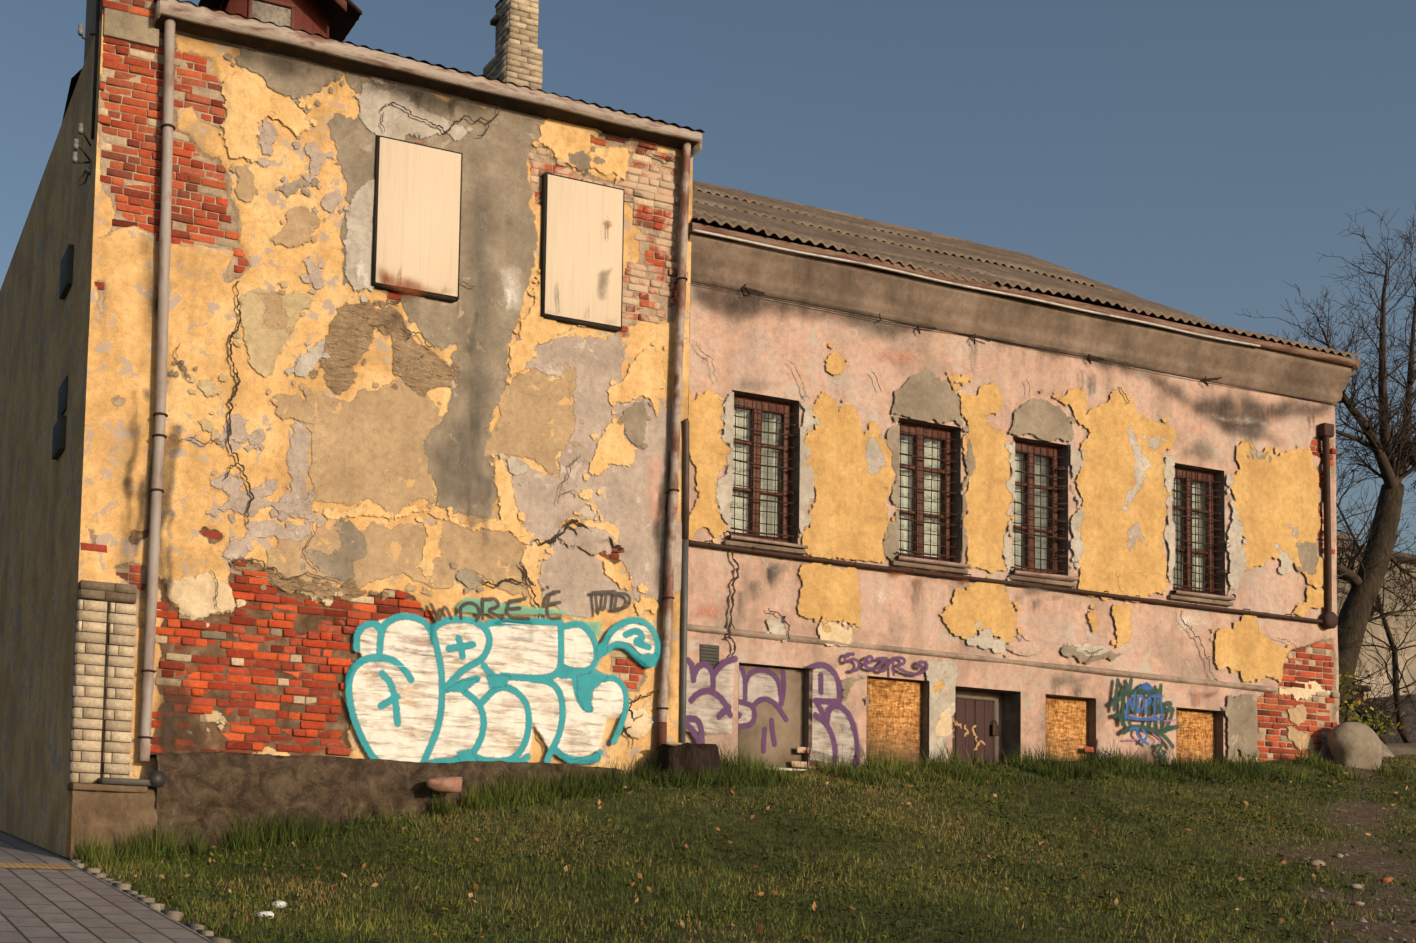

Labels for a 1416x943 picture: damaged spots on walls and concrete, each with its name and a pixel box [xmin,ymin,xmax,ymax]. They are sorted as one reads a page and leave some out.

crack [170,281,341,611]
corrosion [383,271,422,291]
peeling [80,10,732,759]
crack [725,540,739,656]
crack [768,608,790,639]
peeling [766,390,899,647]
peeling [826,342,849,376]
peeling [940,371,1023,657]
peeling [1040,386,1177,665]
peeling [1211,615,1340,762]
peeling [1230,437,1337,617]